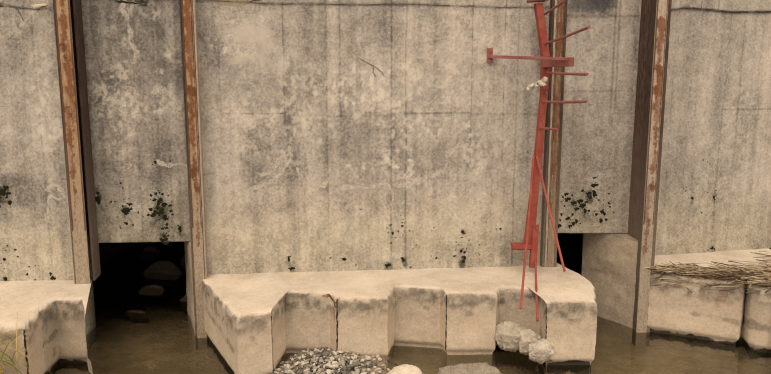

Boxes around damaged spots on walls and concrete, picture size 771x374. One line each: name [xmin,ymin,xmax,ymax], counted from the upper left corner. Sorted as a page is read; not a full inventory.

corrosion [54,0,86,231]
corrosion [181,0,202,246]
corrosion [643,0,668,253]